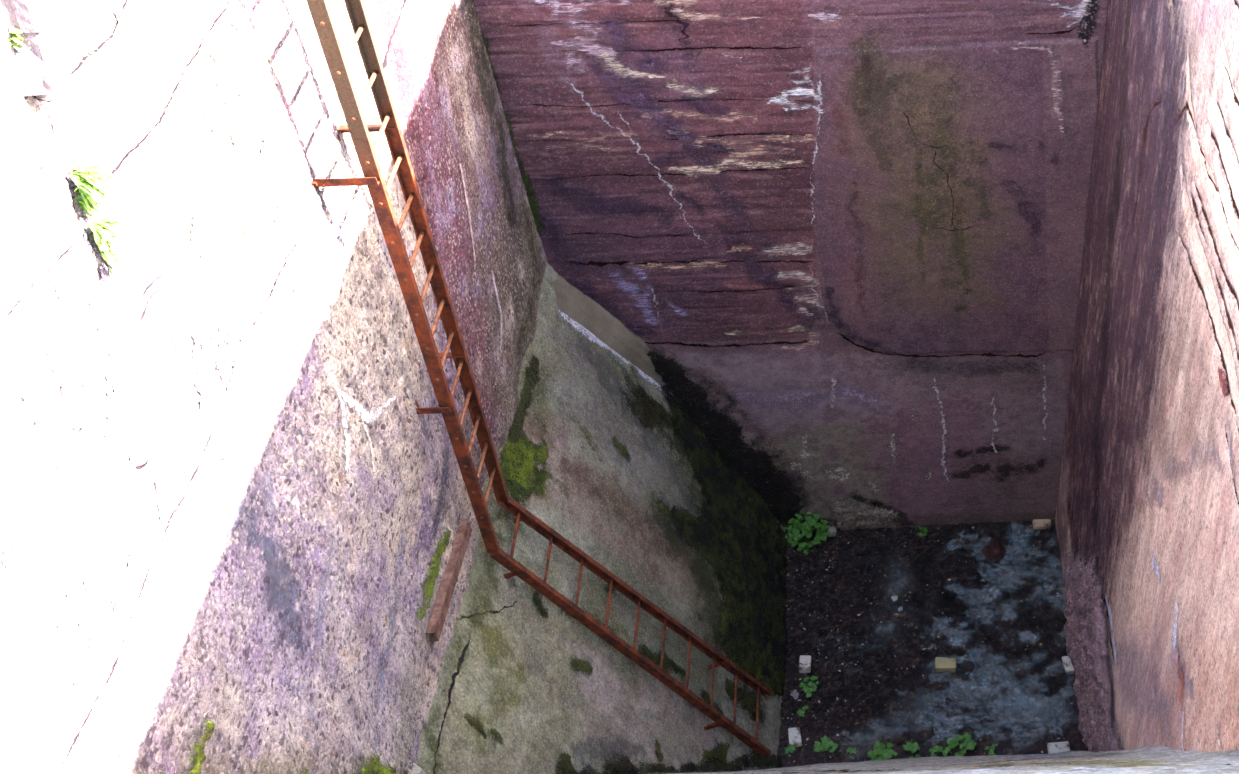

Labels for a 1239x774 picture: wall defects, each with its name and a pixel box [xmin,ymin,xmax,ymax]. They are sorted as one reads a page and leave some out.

crack [433,601,517,774]